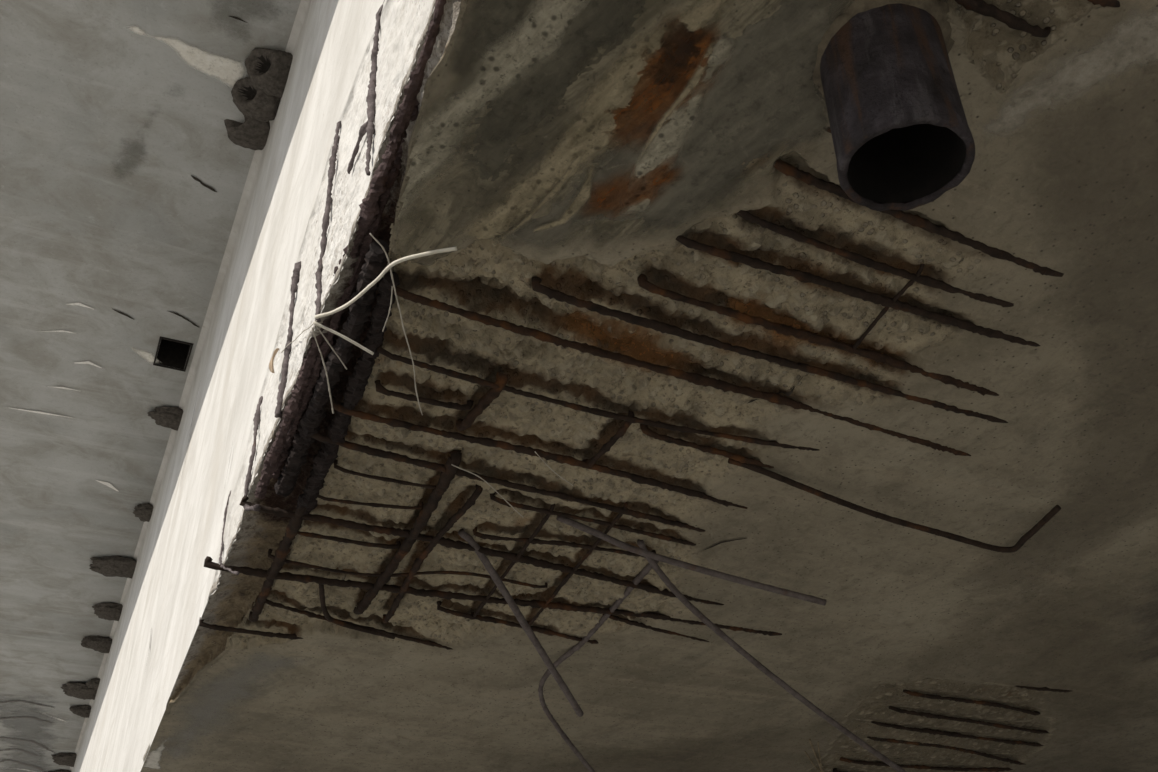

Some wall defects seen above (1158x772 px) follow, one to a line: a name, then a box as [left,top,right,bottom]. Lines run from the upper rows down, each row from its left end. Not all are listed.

leakage [396,0,836,246]
rust [611,23,714,141]
spalling [941,0,1131,113]
rust [589,163,676,211]
spalling [165,0,1035,716]
rust [566,312,681,369]
leakage [0,699,66,772]
spalling [801,674,1059,772]